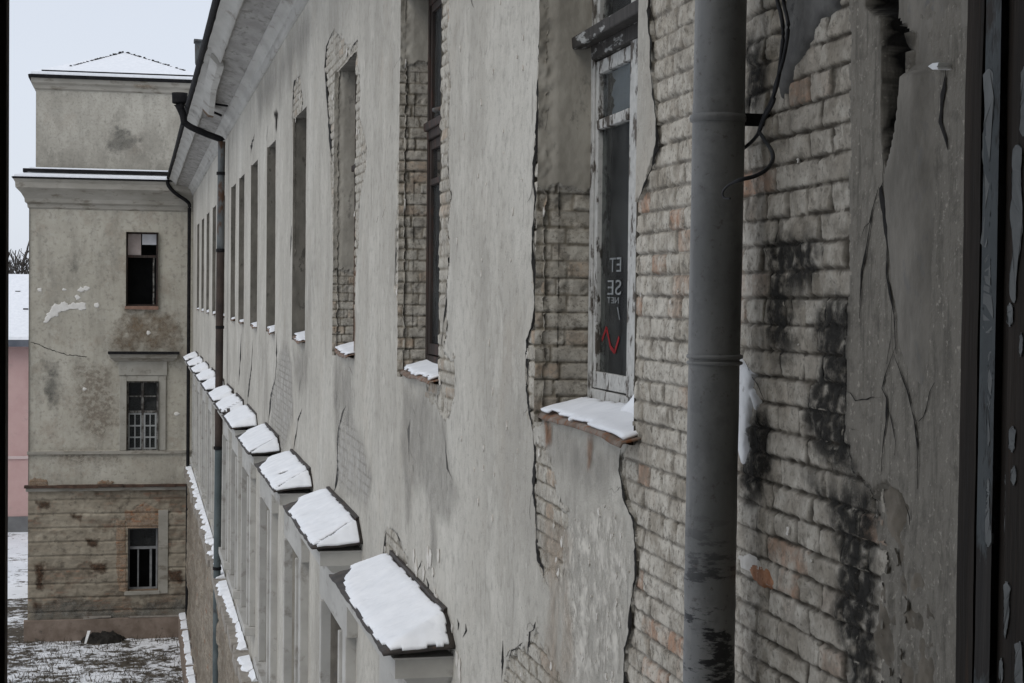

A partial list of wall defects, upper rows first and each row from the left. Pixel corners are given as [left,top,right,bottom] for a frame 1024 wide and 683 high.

peeling [43,286,99,323]
spalling [325,27,367,329]
spalling [425,0,456,422]
spalling [503,0,695,683]
spalling [734,0,938,683]
crack [845,153,934,525]
crack [938,71,948,150]
peeling [980,69,995,333]
peeling [1006,67,1024,357]